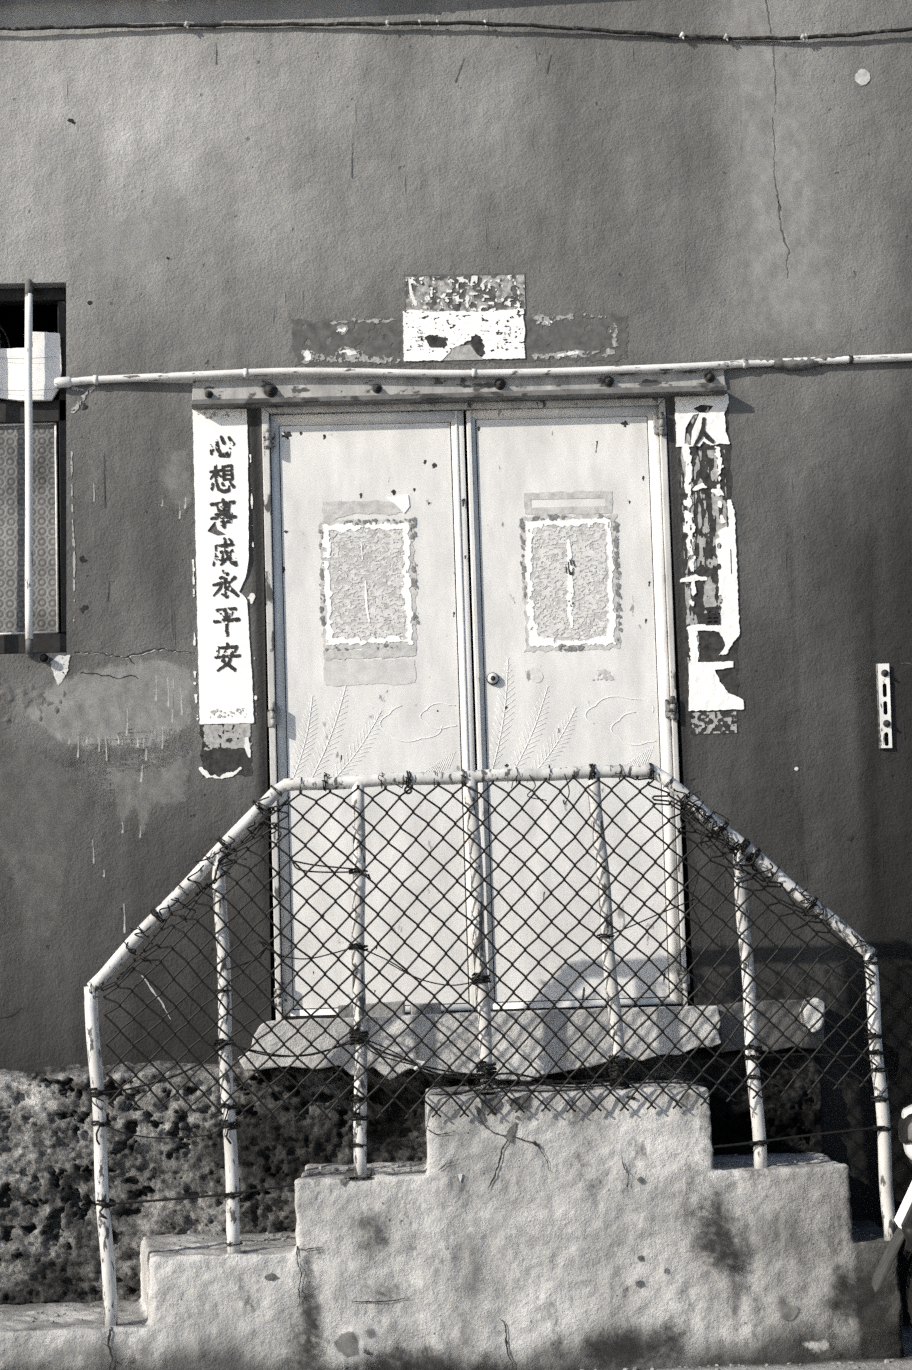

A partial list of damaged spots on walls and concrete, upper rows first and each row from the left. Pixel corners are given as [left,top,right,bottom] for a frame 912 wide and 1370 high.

crack [765,0,790,278]
water stain [0,658,195,937]
crack [426,1108,550,1189]